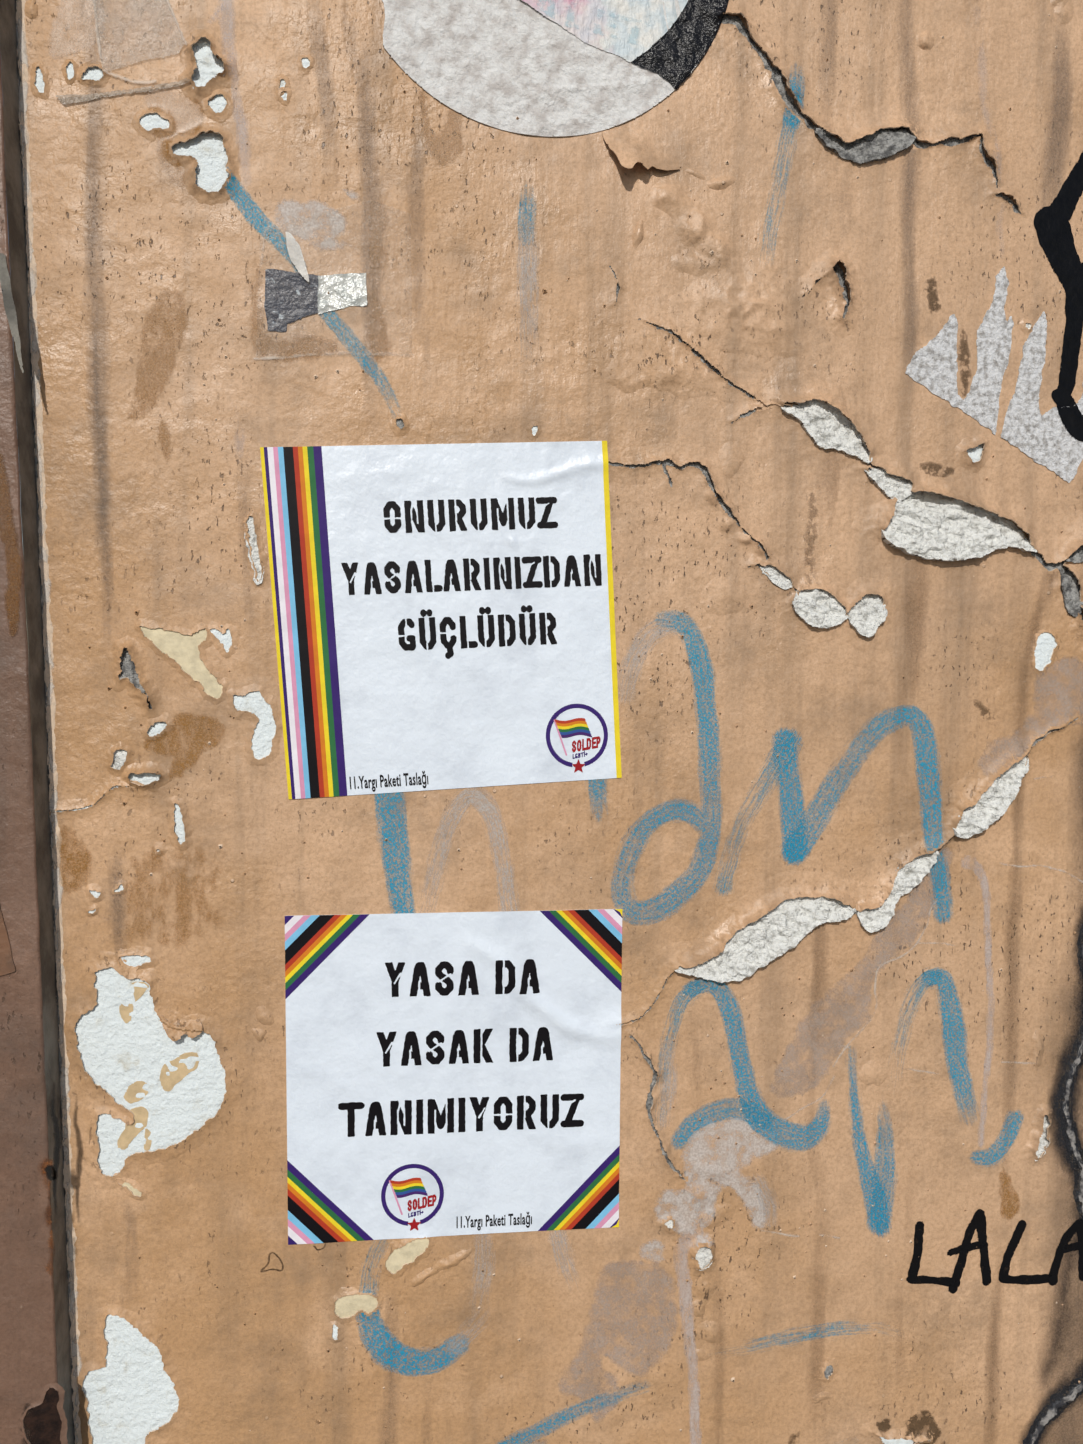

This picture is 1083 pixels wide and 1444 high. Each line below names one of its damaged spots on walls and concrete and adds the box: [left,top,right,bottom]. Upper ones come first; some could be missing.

peeling [0,2,111,406]
peeling [131,29,241,206]
peeling [602,127,681,171]
peeling [788,247,863,338]
peeling [35,436,50,604]
peeling [955,435,990,473]
peeling [104,618,283,858]
crack [591,249,1083,1216]
peeling [1029,630,1060,677]
peeling [49,789,63,990]
peeling [85,879,128,917]
peeling [45,945,243,1444]